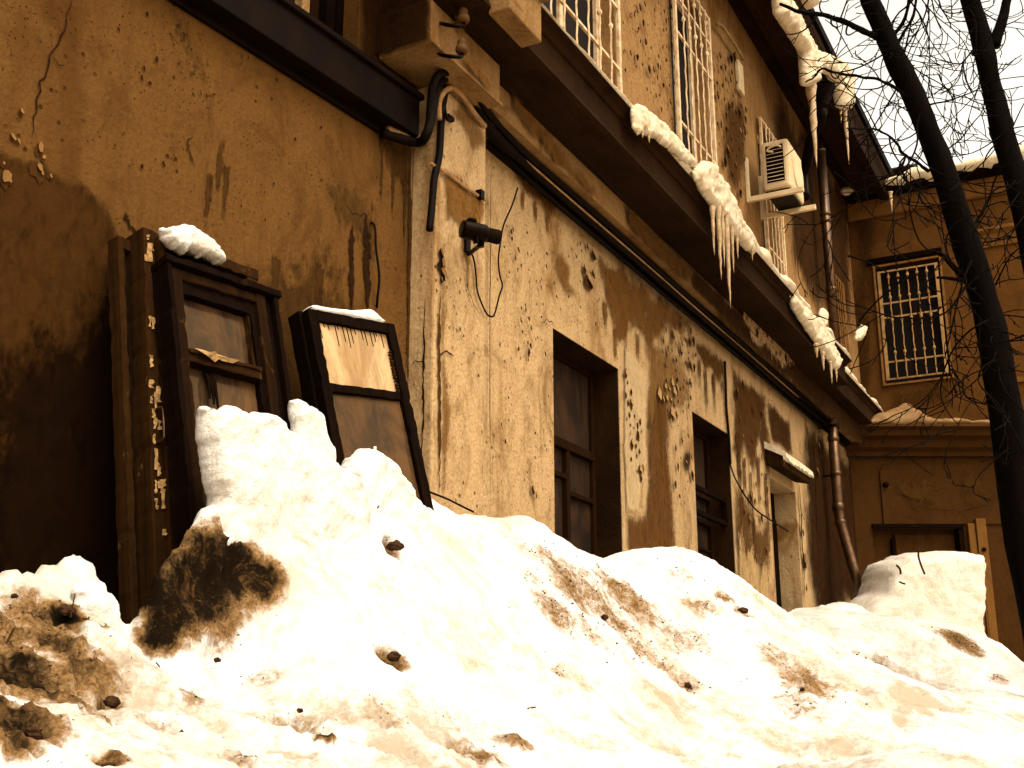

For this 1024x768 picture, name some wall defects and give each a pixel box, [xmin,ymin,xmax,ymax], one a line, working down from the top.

crack [31,2,72,136]
peeling [0,159,12,190]
peeling [29,141,53,184]
water stain [204,142,230,217]
water stain [330,137,408,258]
peeling [624,322,697,511]
water stain [598,257,792,594]